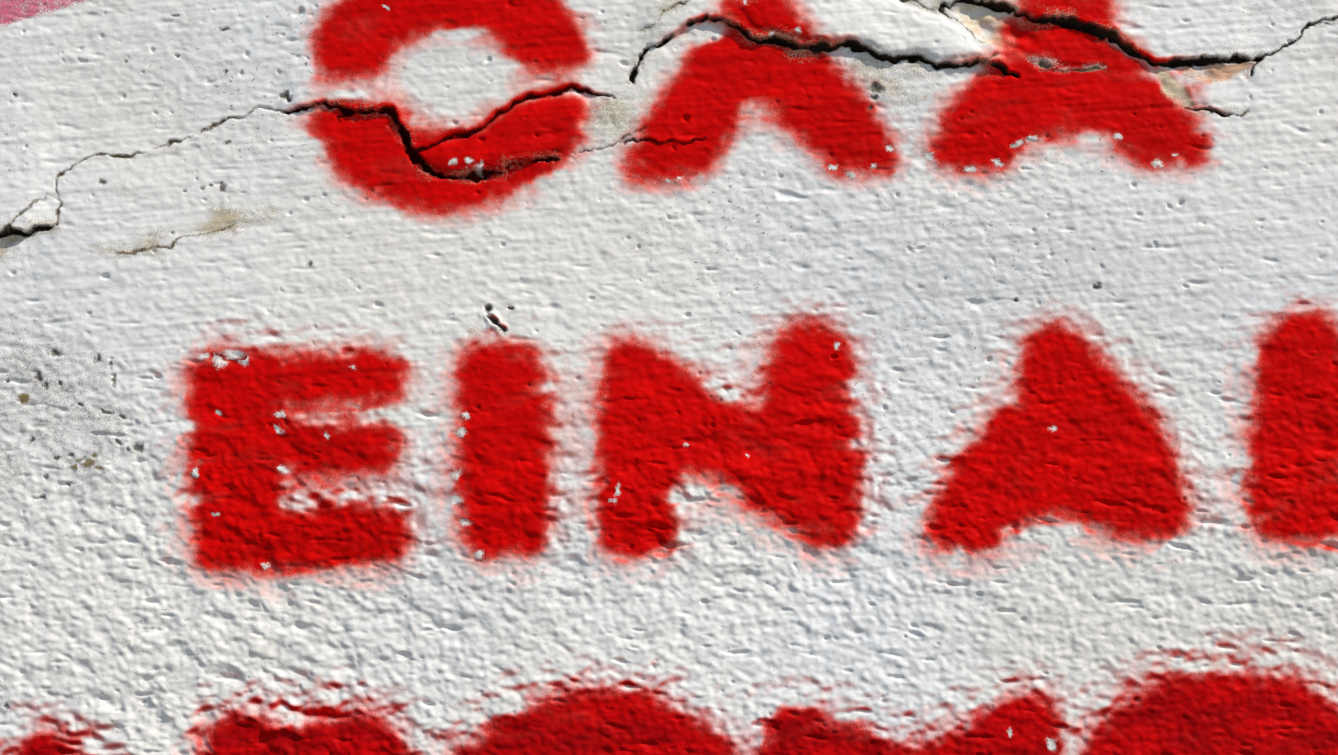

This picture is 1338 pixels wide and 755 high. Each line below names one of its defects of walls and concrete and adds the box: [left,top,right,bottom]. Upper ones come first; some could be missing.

crack [115,223,236,255]
crack [0,0,1338,245]